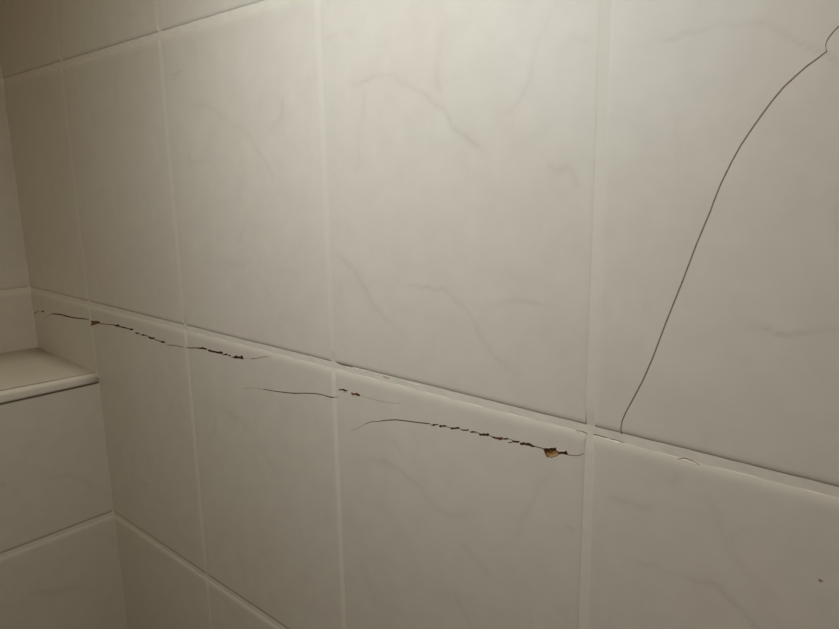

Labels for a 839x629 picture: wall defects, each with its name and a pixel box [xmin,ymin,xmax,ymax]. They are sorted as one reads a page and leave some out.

crack [351,26,839,458]
crack [34,311,268,359]
crack [243,387,334,398]